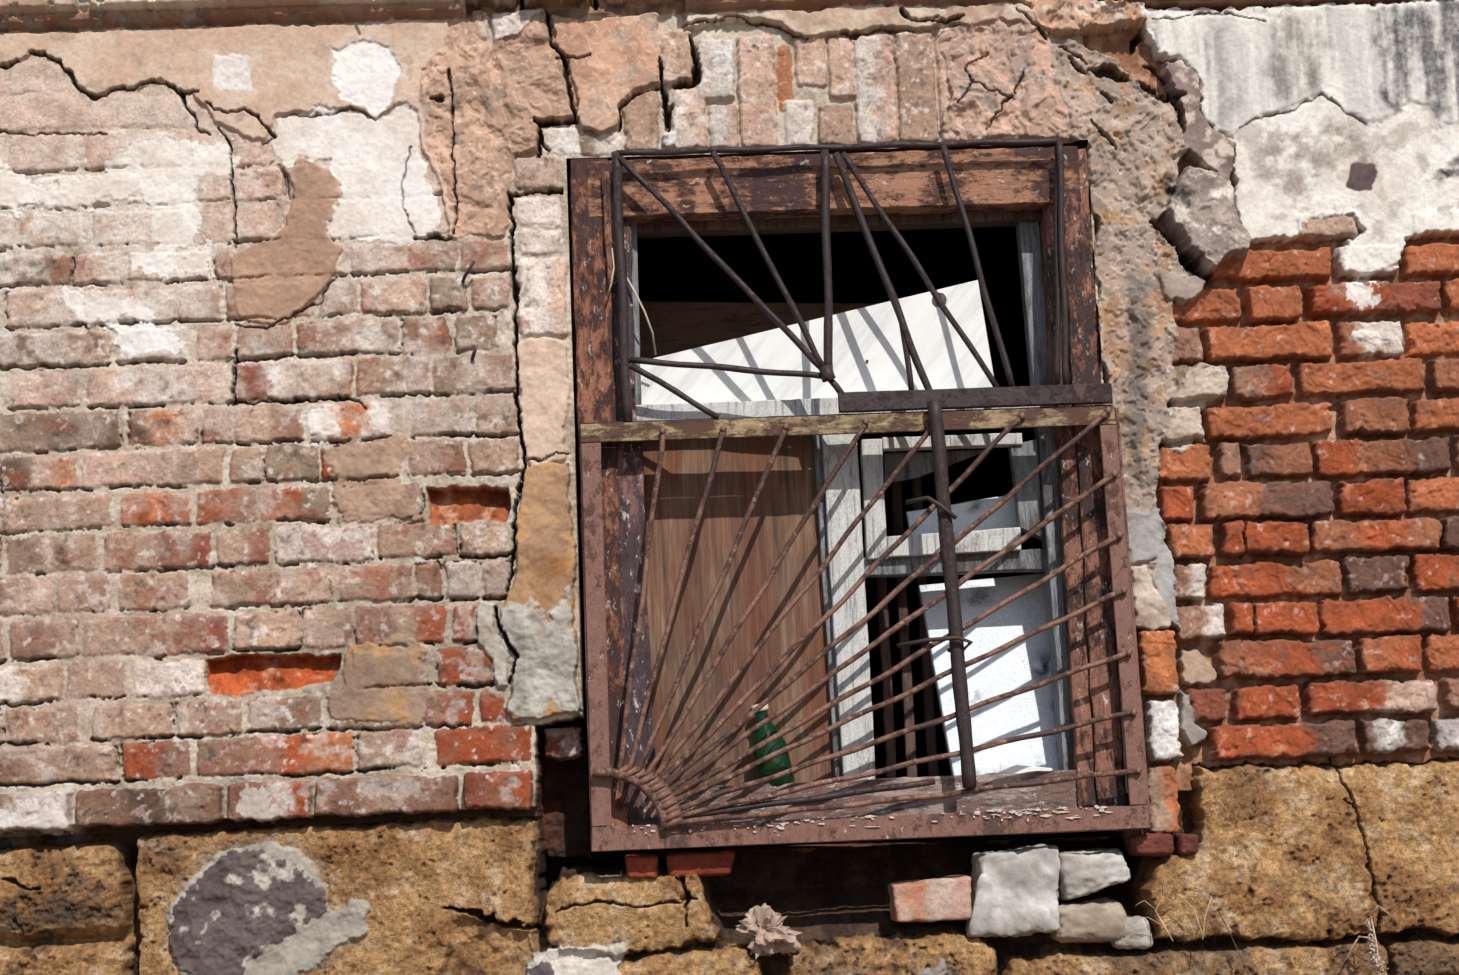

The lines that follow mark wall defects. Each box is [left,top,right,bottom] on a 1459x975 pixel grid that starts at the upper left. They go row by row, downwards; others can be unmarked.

crack [0,49,378,248]
crack [400,69,460,242]
crack [618,8,965,133]
crack [957,52,1026,130]
crack [1016,7,1268,151]
leakage [1381,1,1459,110]
peeling [56,286,186,362]
crack [495,0,589,686]
crack [1150,221,1213,285]
flaking render [683,0,1459,834]
crack [442,877,699,932]
crack [1328,758,1384,937]